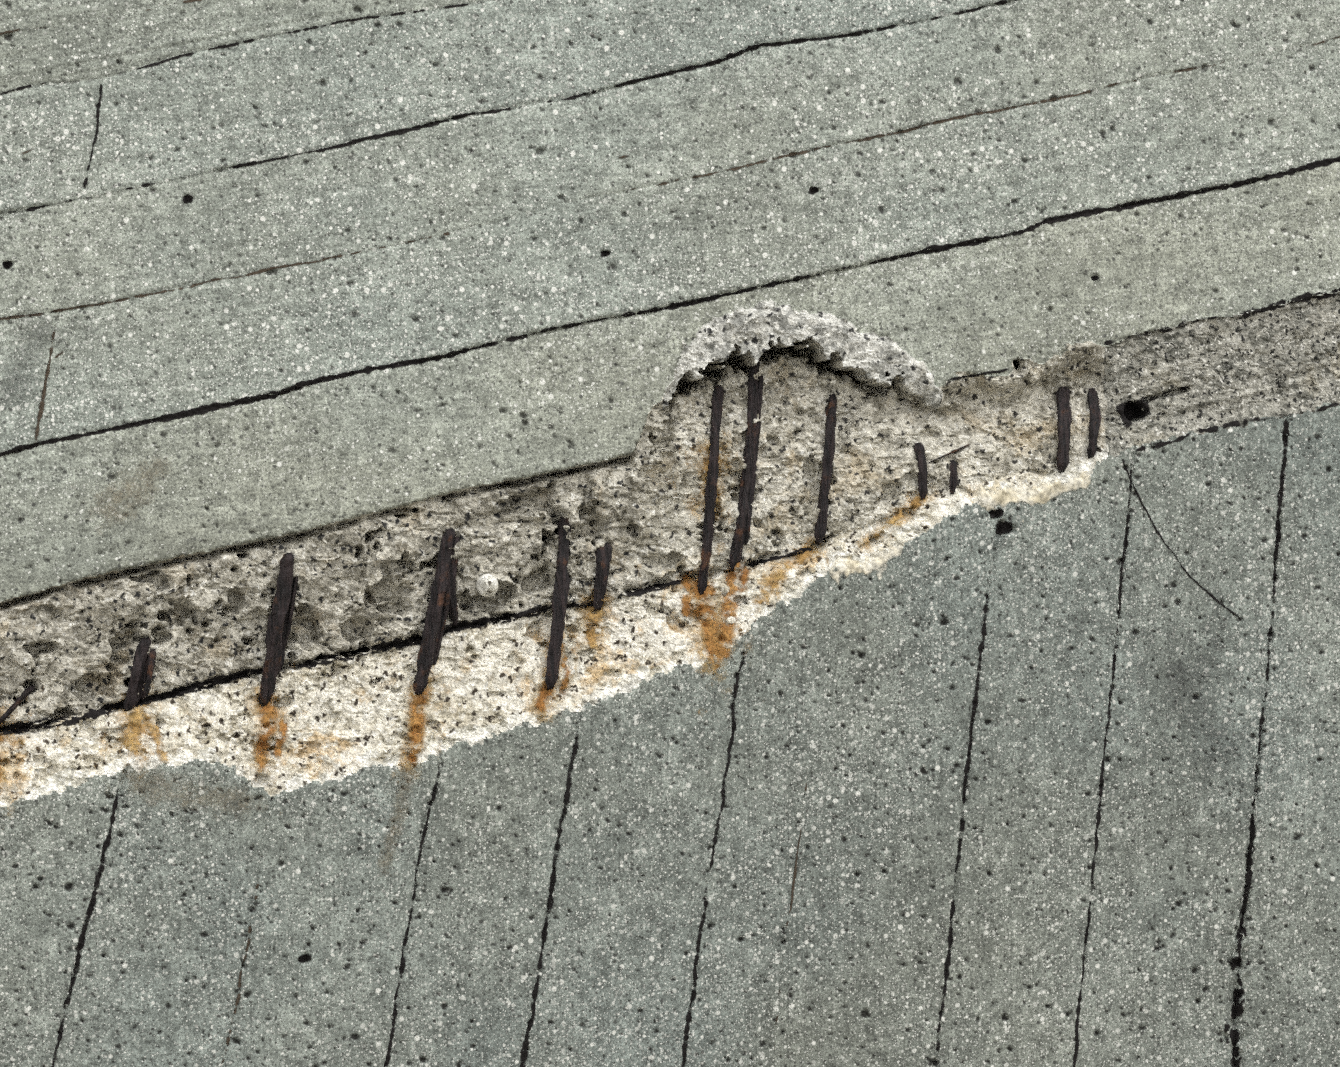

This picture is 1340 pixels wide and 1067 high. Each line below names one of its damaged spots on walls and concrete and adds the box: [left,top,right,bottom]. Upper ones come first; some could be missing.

crack [0,2,511,213]
crack [547,0,1016,102]
crack [0,156,1340,457]
corrosion [125,705,167,761]
corrosion [254,697,287,769]
corrosion [403,688,428,765]
corrosion [536,645,570,712]
spalling [0,338,1150,807]
corrosion [682,562,749,670]
crack [1073,403,1338,1067]
crack [52,789,119,1067]
crack [520,733,579,1067]